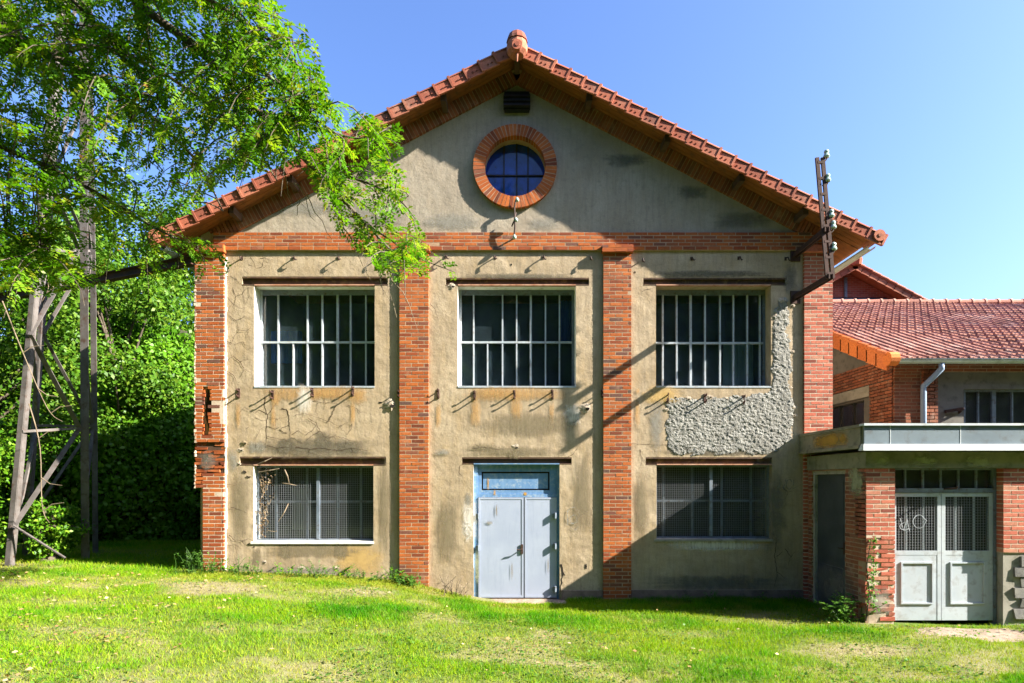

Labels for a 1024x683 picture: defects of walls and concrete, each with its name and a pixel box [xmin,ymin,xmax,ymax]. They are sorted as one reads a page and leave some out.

crack [239,397,367,455]
rust [272,389,364,424]
rust [473,389,550,421]
peeling [663,297,798,455]